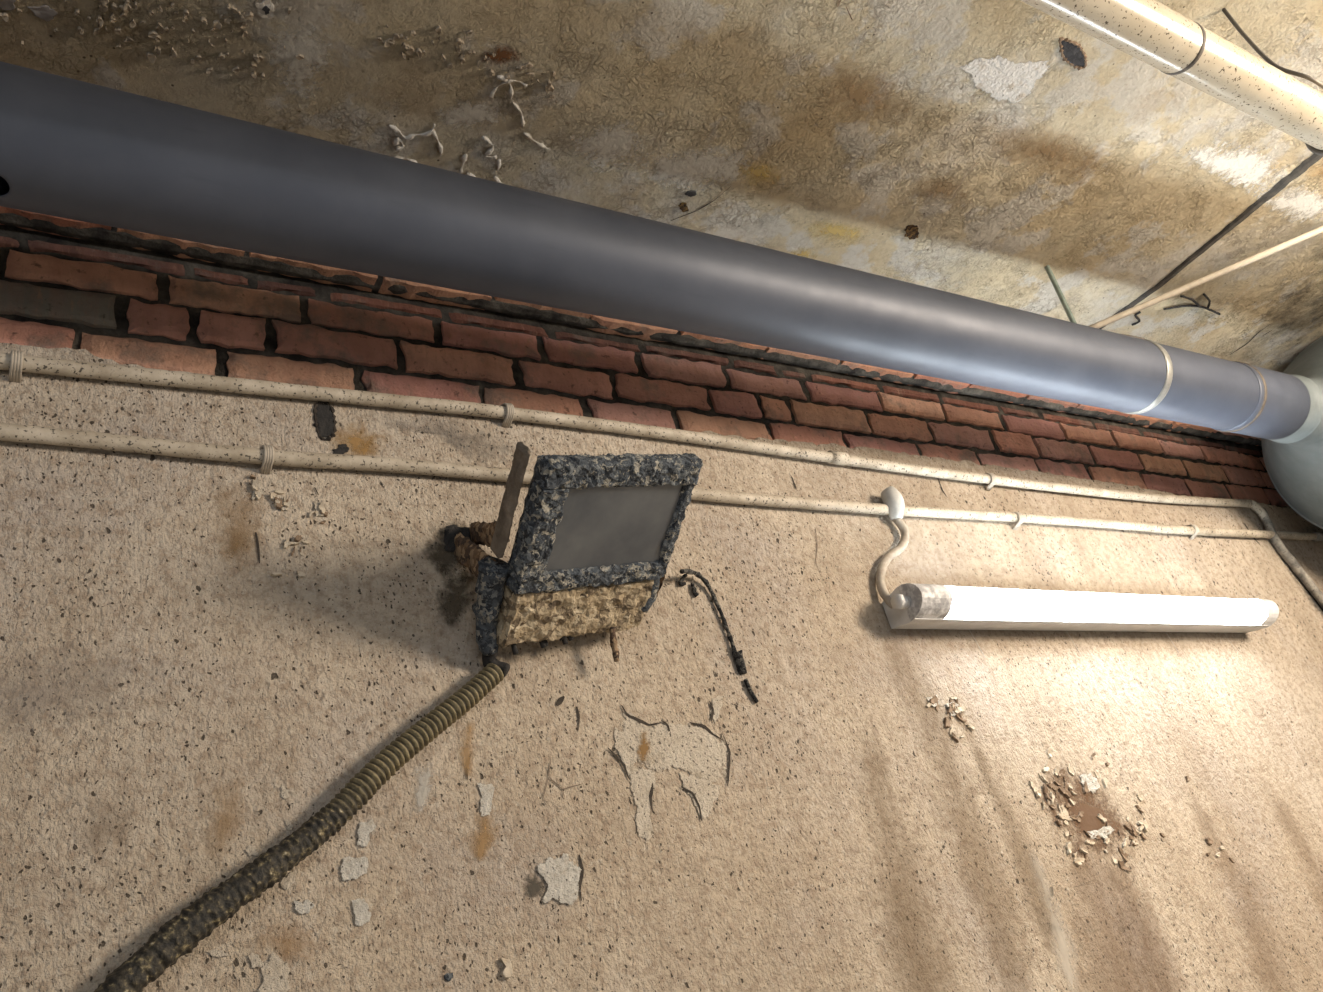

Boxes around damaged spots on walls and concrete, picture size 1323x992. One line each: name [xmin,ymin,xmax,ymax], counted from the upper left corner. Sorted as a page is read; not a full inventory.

peeling [0,0,291,80]
peeling [377,25,557,103]
peeling [960,55,1050,103]
spalling [926,695,976,743]
flaking render [608,695,731,843]
spalling [1029,747,1166,872]
flaking render [339,819,376,882]
flaking render [538,853,582,905]
spalling [1205,837,1235,863]
flaking render [352,898,372,927]